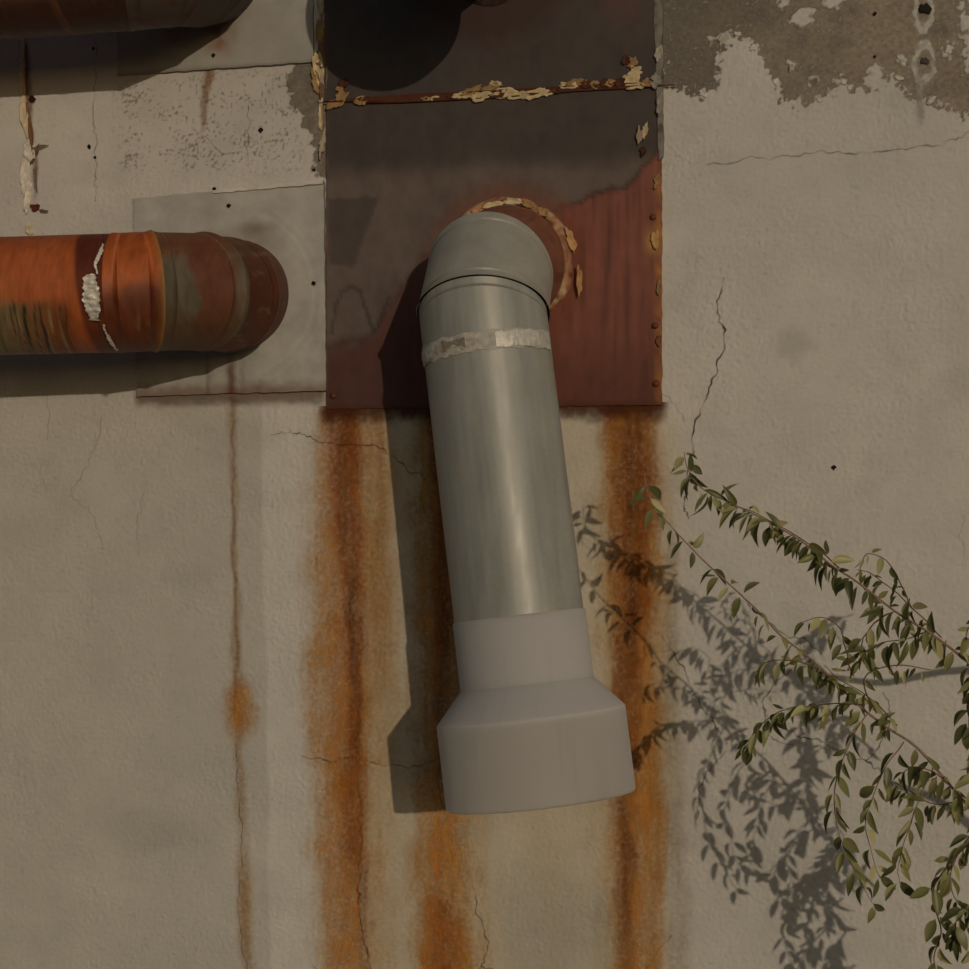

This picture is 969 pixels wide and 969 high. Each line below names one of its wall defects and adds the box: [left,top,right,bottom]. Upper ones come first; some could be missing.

peeling [286,0,969,177]
crack [691,292,726,439]
rust [308,406,472,969]
rust [559,402,664,969]